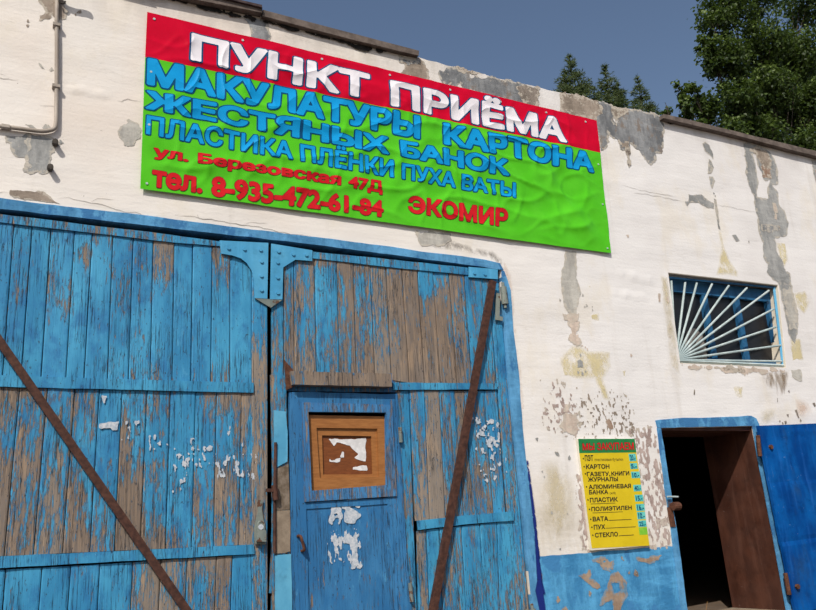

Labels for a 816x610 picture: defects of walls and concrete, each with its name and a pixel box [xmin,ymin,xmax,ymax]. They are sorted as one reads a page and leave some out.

peeling [38,0,82,21]
peeling [399,54,540,106]
peeling [5,133,63,174]
peeling [118,119,141,146]
peeling [559,92,665,167]
peeling [685,142,720,229]
peeling [743,142,799,343]
peeling [559,250,593,376]
peeling [541,379,671,610]